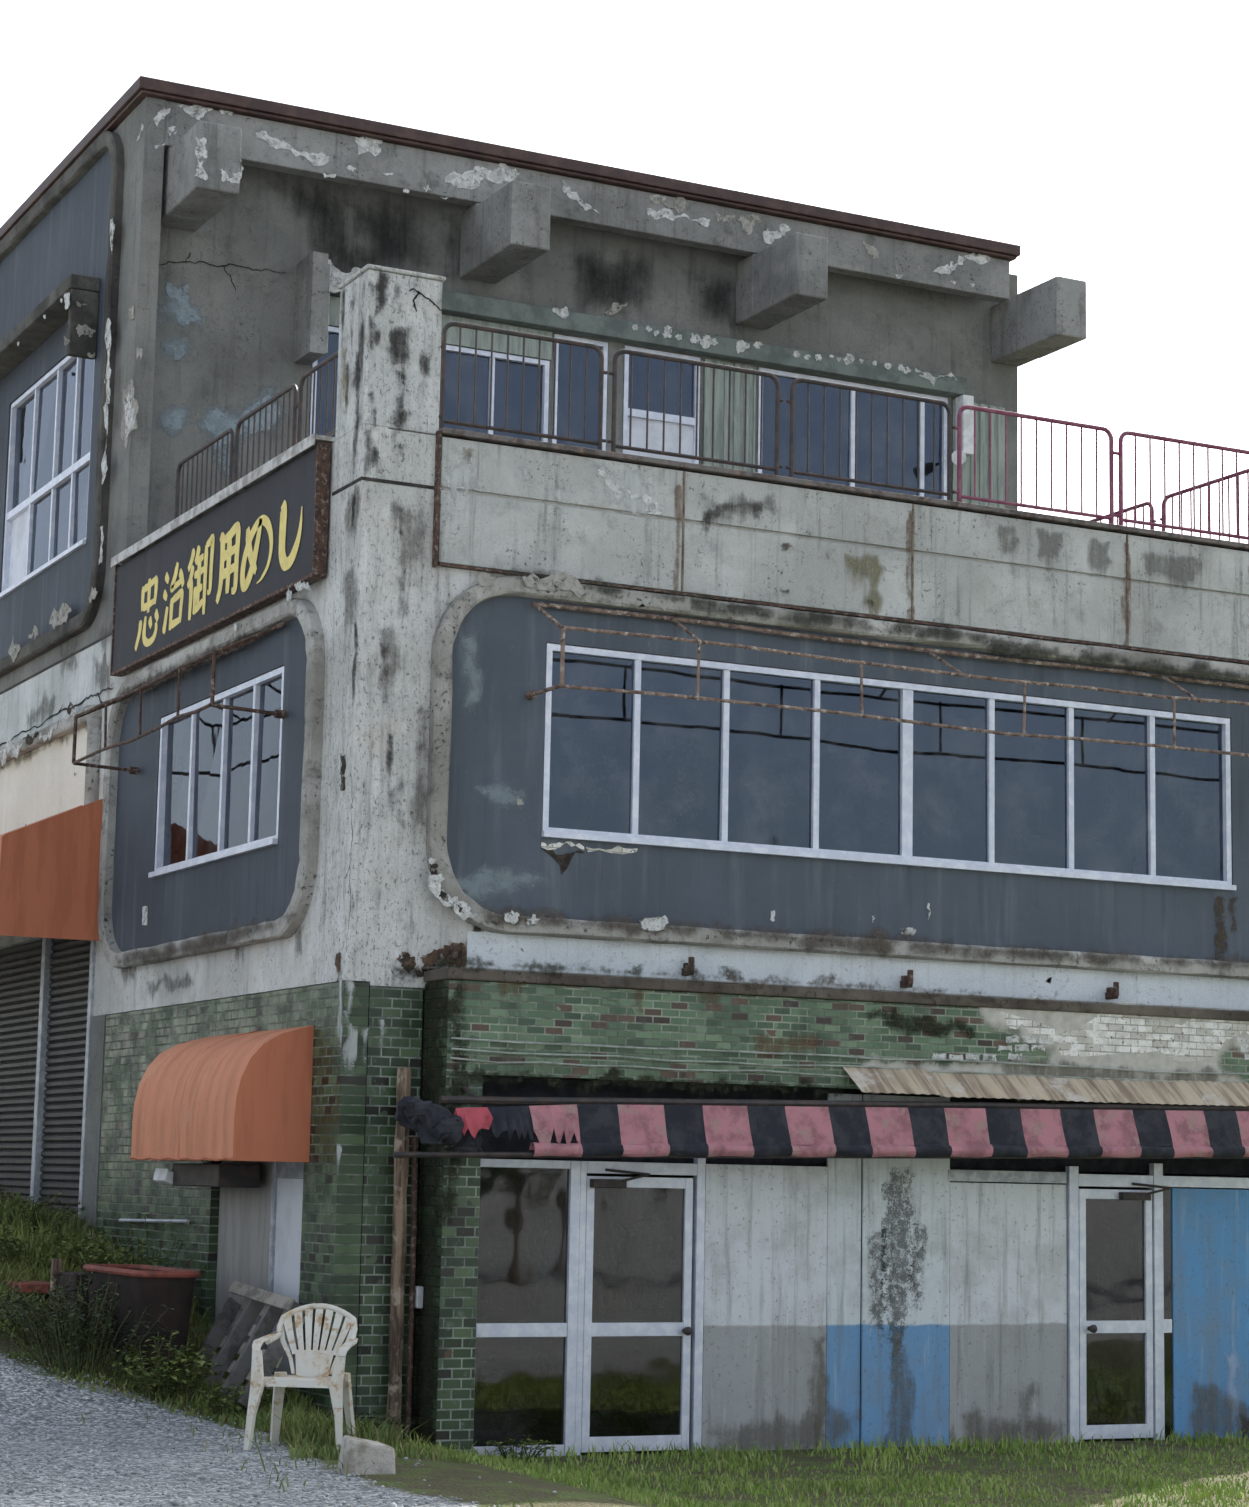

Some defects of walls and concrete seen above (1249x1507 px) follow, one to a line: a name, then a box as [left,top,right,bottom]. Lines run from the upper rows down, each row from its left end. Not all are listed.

peeling [646,194,791,244]
crack [159,253,285,291]
damp [294,190,429,473]
spalling [60,292,139,485]
damp [345,571,358,699]
crack [0,687,114,746]
peeling [425,857,477,920]
spalling [541,841,638,874]
rust [1214,897,1236,961]
damp [338,978,384,1063]
spalling [862,997,1249,1083]
damp [869,1168,927,1441]